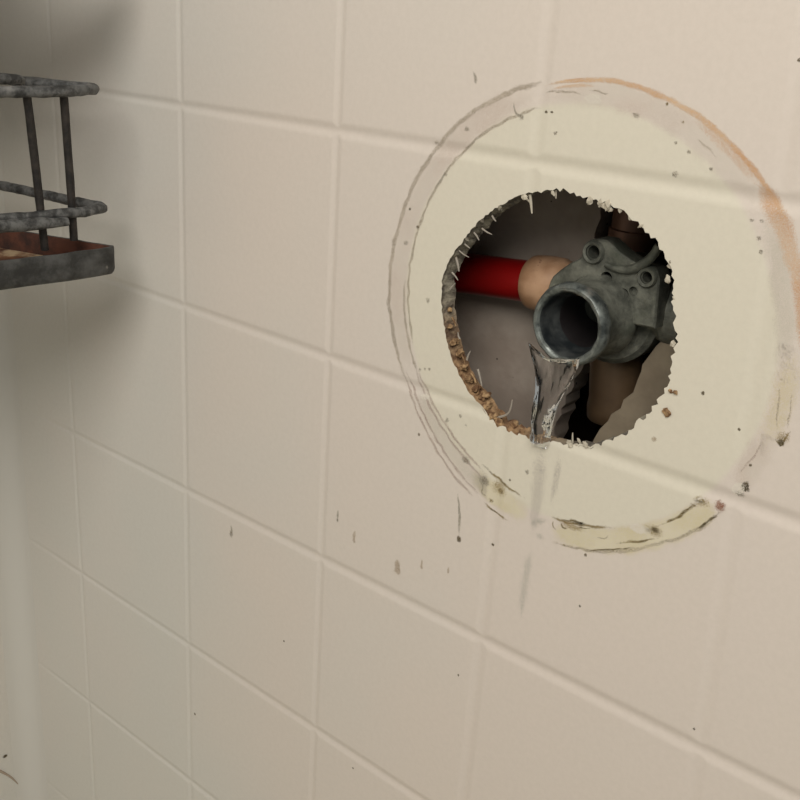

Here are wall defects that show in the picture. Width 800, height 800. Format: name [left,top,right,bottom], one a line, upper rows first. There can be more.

spalling [586,196,631,220]
corrosion [551,77,800,344]
spalling [443,192,540,433]
spalling [551,372,602,449]
leakage [479,475,511,503]